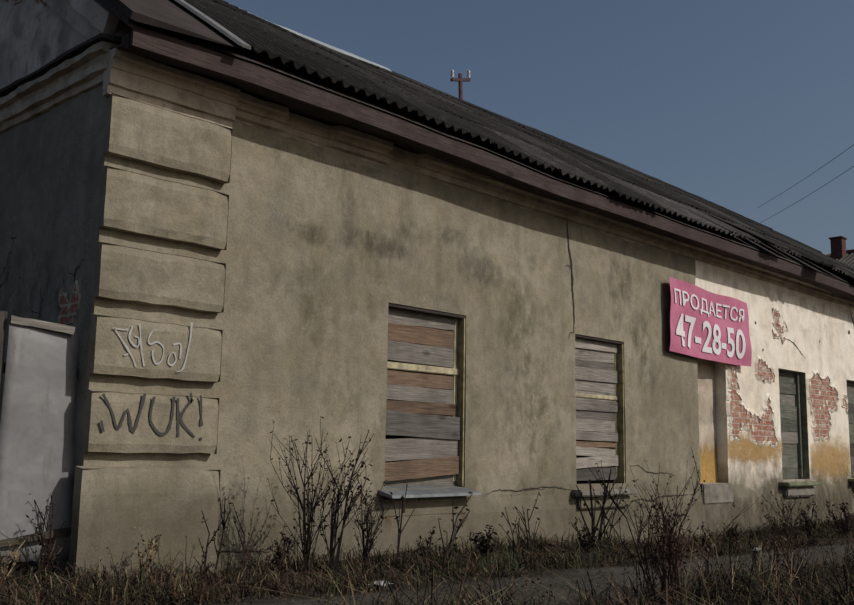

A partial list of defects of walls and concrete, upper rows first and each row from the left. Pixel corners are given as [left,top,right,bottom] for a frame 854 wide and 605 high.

crack [566,214,575,337]
flaking render [58,280,81,325]
flaking render [772,307,789,345]
flaking render [726,349,779,448]
flaking render [806,370,848,442]
crack [488,484,571,497]
crack [630,464,689,507]